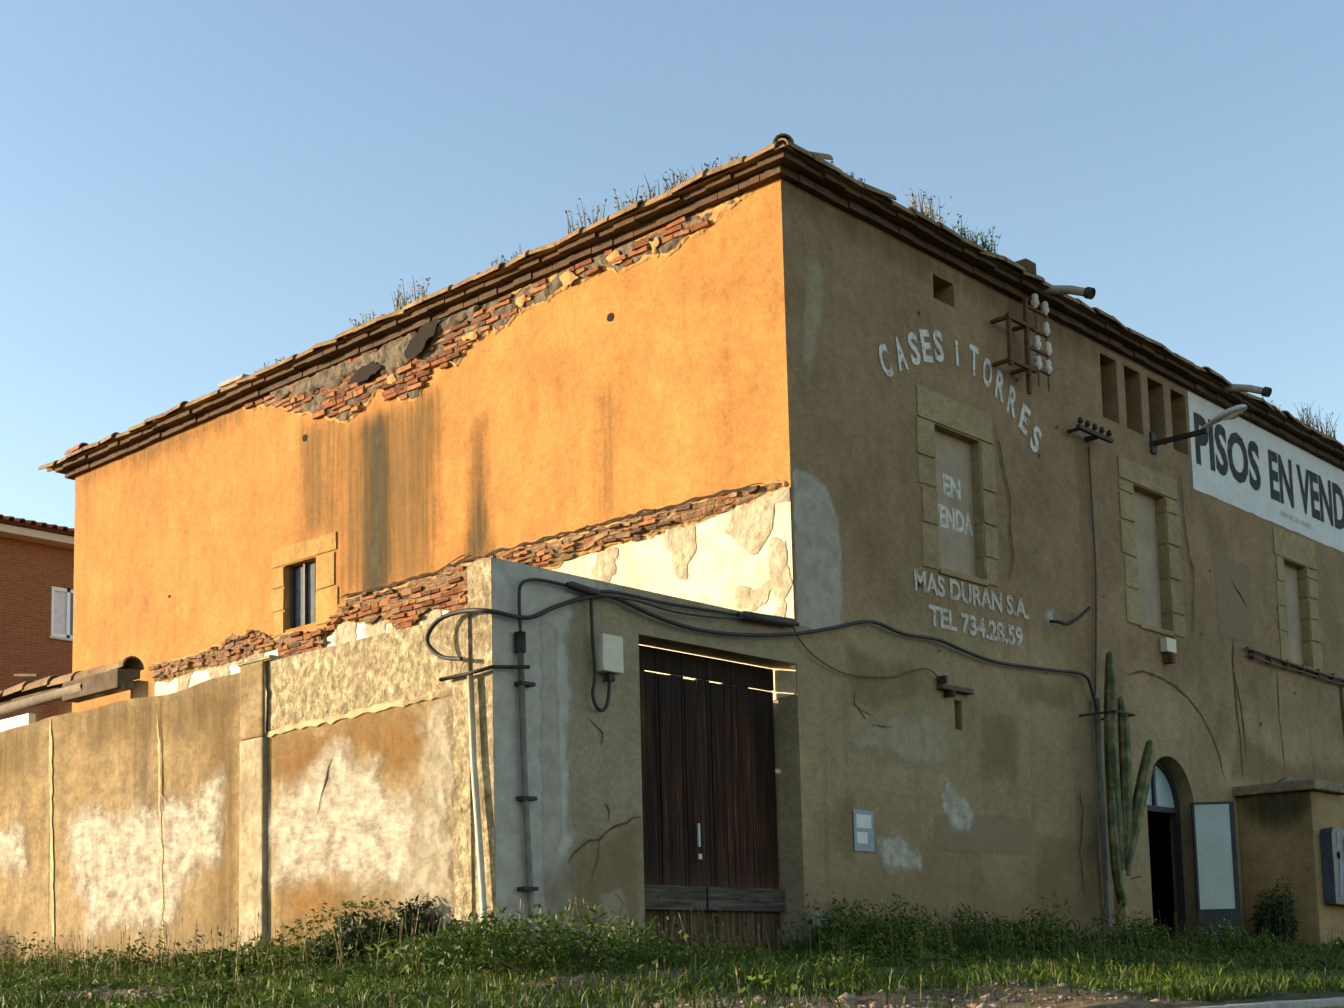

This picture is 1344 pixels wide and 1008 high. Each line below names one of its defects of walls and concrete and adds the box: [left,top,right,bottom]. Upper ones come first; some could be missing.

flaking render [243,191,753,423]
damp [348,410,429,594]
flaking render [148,480,796,701]
damp [468,483,486,560]
crack [316,752,334,816]
crack [568,803,641,914]